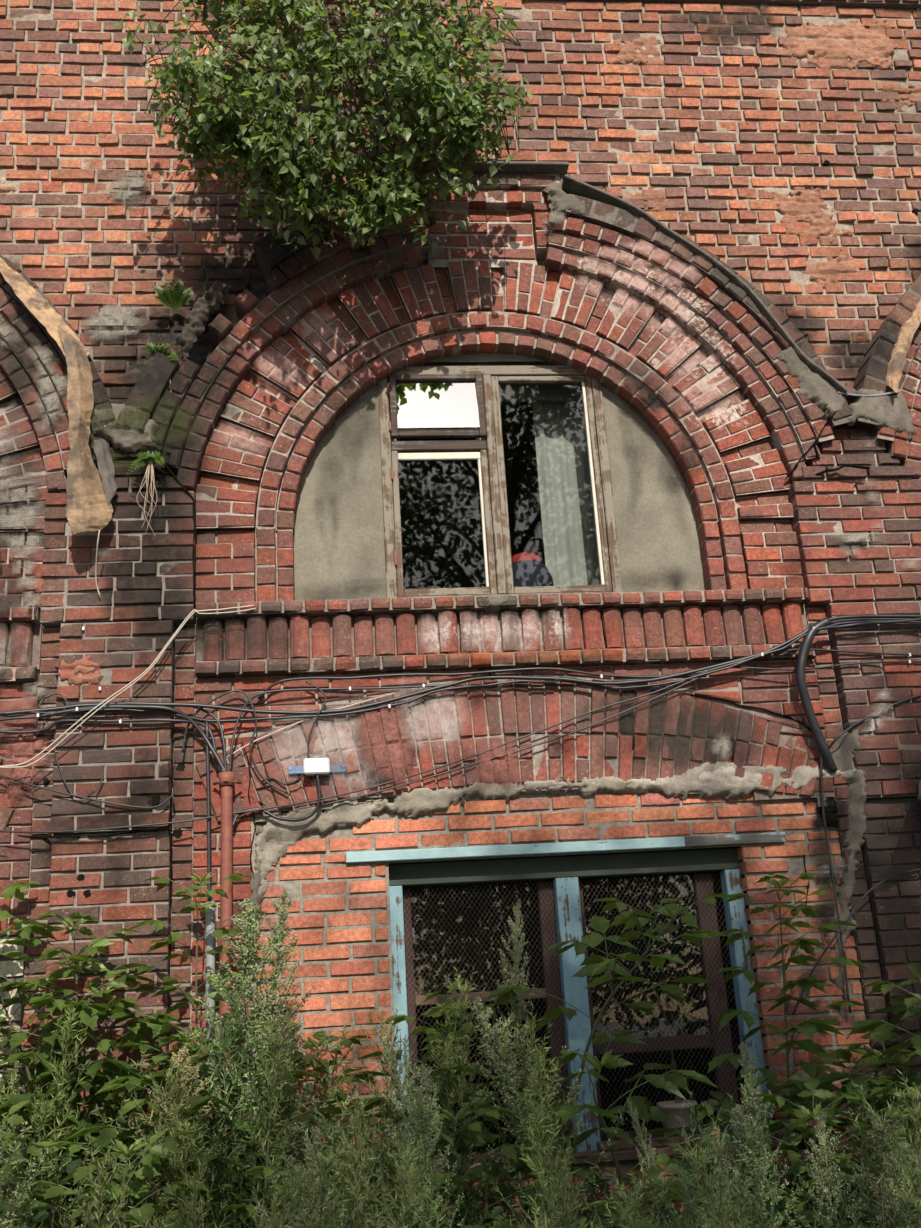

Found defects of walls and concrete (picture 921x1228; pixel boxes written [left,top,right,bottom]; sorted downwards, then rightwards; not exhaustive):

crack [785,411,871,480]
spalling [480,747,515,784]